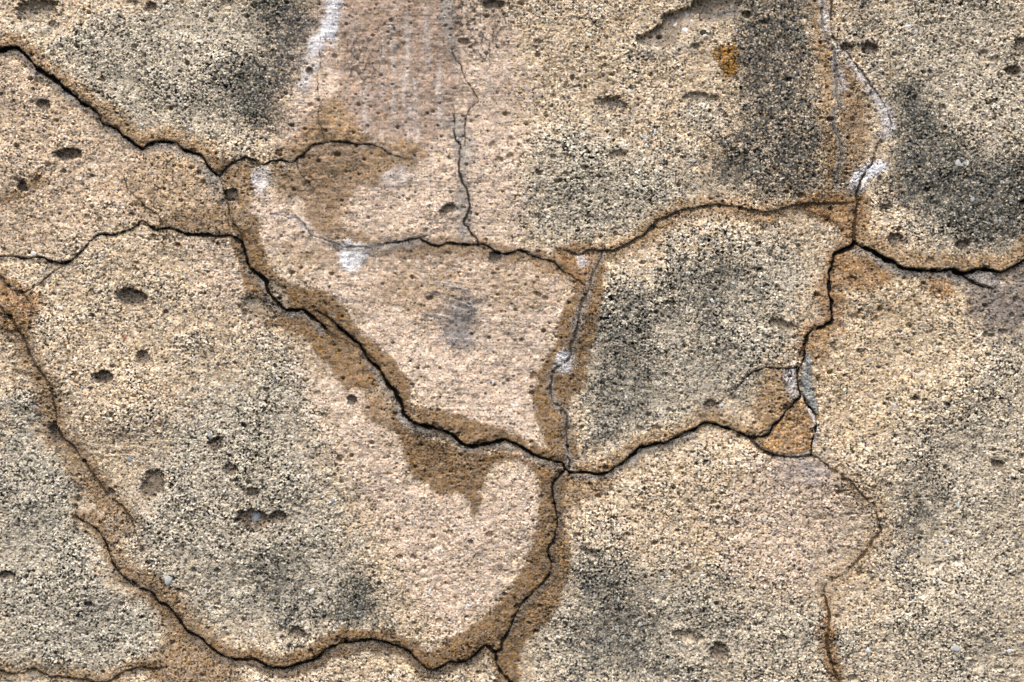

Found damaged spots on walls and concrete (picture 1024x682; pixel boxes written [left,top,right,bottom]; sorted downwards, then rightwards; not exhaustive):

crack [346,37,381,84]
crack [821,0,845,186]
damp [691,0,1024,255]
crack [0,46,1024,562]
damp [688,235,771,332]
damp [209,216,684,682]
flaking render [763,351,818,453]
crack [0,666,166,682]
crack [71,514,555,682]
crack [824,512,883,682]